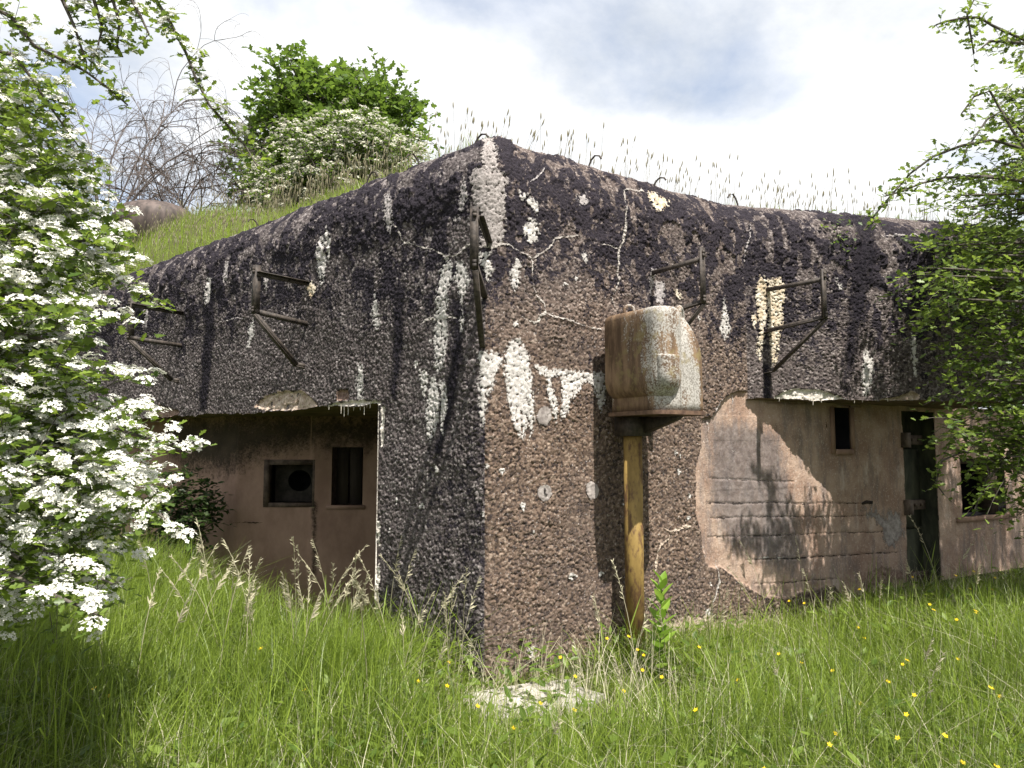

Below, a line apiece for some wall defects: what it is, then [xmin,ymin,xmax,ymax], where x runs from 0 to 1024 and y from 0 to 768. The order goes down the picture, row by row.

leakage [389,257,471,473]
crack [393,223,605,330]
efflorescence [476,321,606,441]
crack [603,188,653,306]
leakage [752,275,786,398]
spalling [774,388,843,401]
spalling [880,391,920,401]
spalling [254,389,386,614]